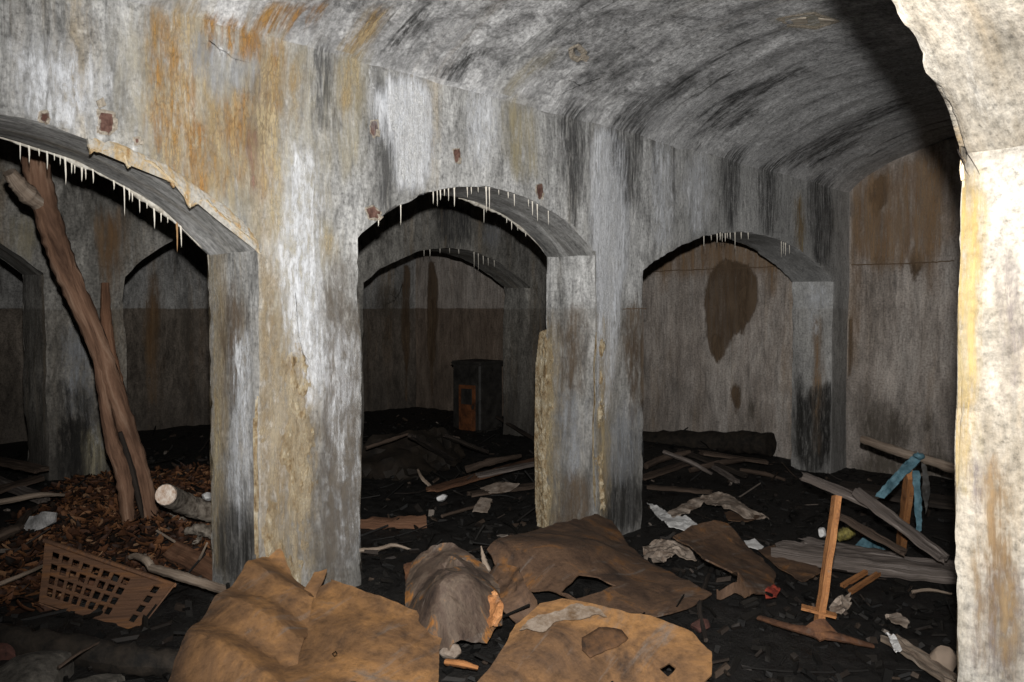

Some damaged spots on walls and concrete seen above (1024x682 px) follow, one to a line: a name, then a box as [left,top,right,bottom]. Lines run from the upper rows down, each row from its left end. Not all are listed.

peeling [86,97,263,255]
corrosion [147,5,312,228]
leakage [704,259,757,362]
leakage [797,315,831,472]